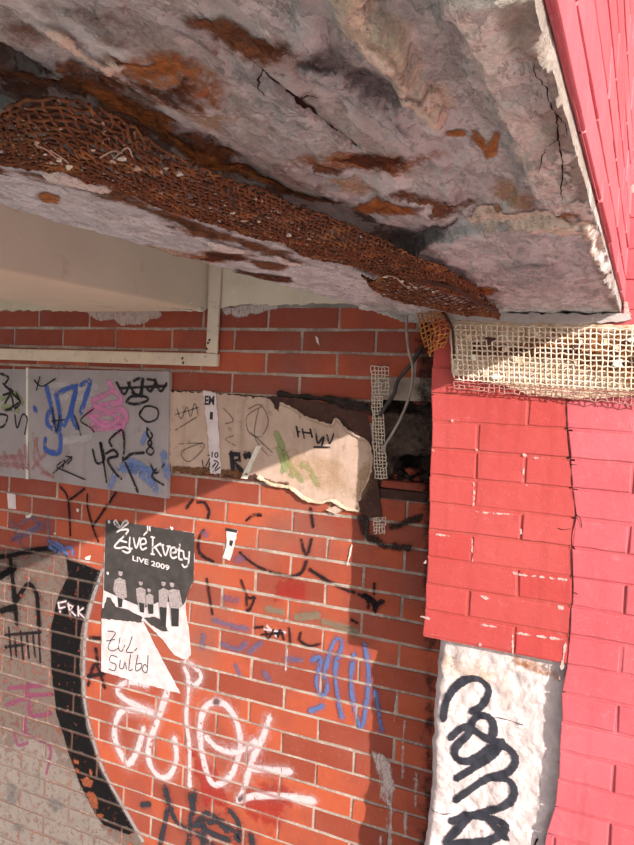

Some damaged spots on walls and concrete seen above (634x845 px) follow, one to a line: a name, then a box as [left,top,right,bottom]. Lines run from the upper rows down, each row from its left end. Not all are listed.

rust [186,17,289,67]
crack [257,68,357,147]
spalling [354,39,448,131]
crack [532,58,568,205]
flaking render [40,171,112,194]
rust [0,38,501,357]
flaking render [207,241,245,254]
spalling [236,270,293,283]
flaking render [273,256,304,266]
peeling [169,390,434,514]
crack [558,398,582,676]